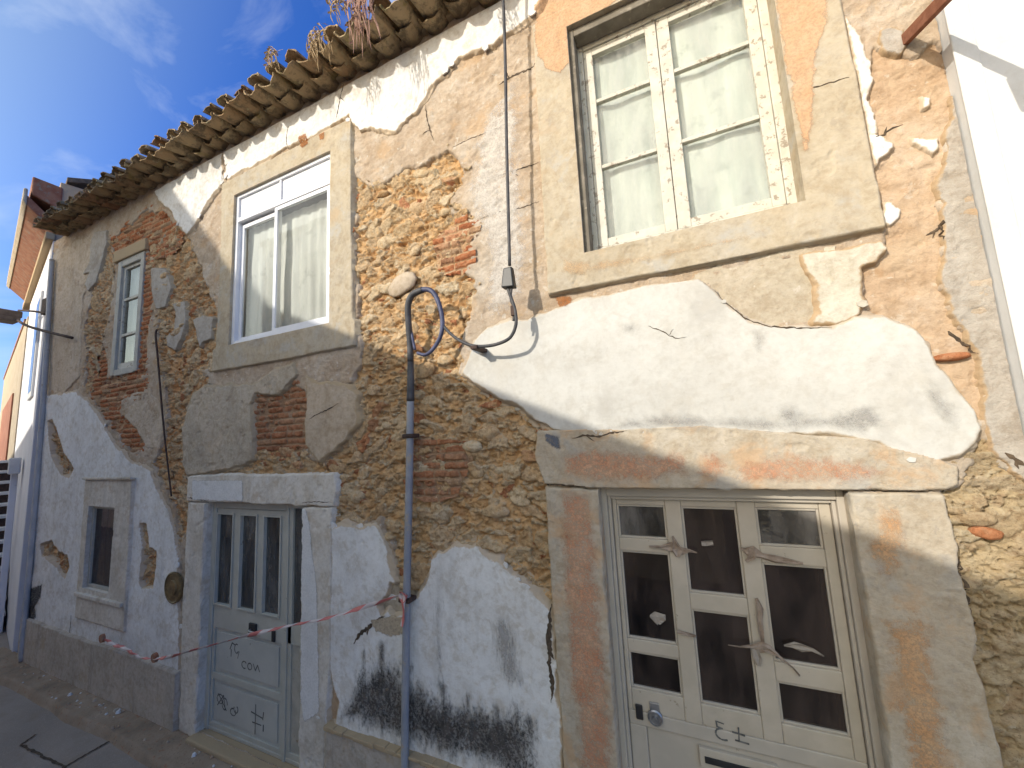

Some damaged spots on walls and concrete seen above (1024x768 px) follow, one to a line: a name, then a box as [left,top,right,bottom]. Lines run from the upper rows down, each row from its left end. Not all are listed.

crack [423,105,486,146]
spalling [693,17,981,420]
crack [926,220,946,239]
spalling [28,0,564,768]
crack [576,430,627,441]
leakage [346,644,533,768]
crack [546,604,555,700]
spalling [941,439,1024,768]